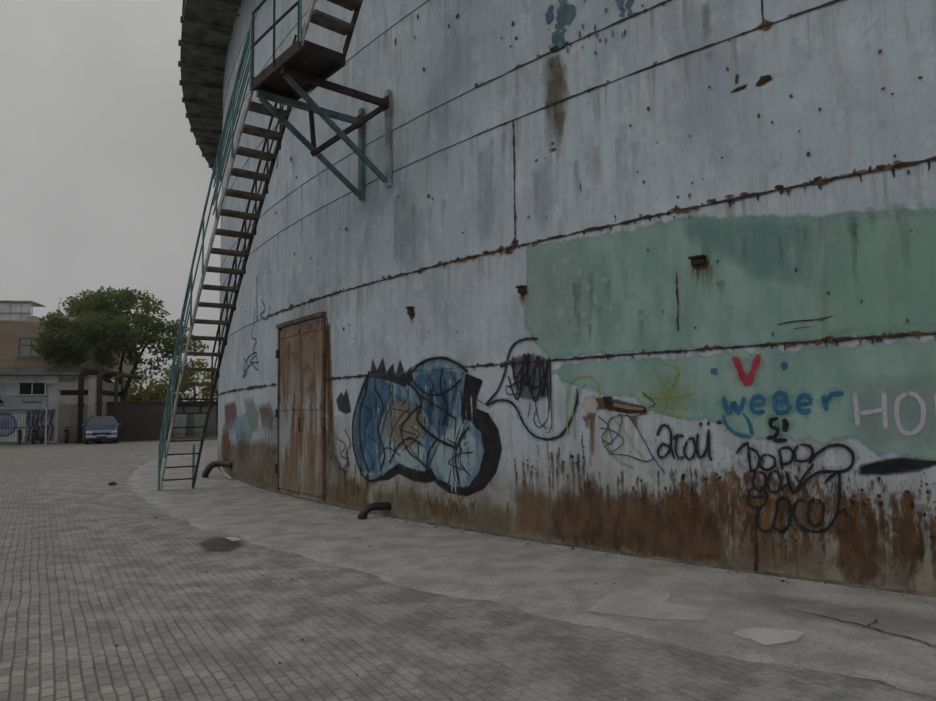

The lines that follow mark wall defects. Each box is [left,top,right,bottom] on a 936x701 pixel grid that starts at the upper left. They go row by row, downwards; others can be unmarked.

peeling [545,0,585,68]
peeling [604,0,644,17]
leakage [546,41,569,131]
rust [267,156,936,319]
rust [221,412,252,470]
spalling [582,396,647,451]
rust [325,319,936,585]
crack [792,608,936,646]